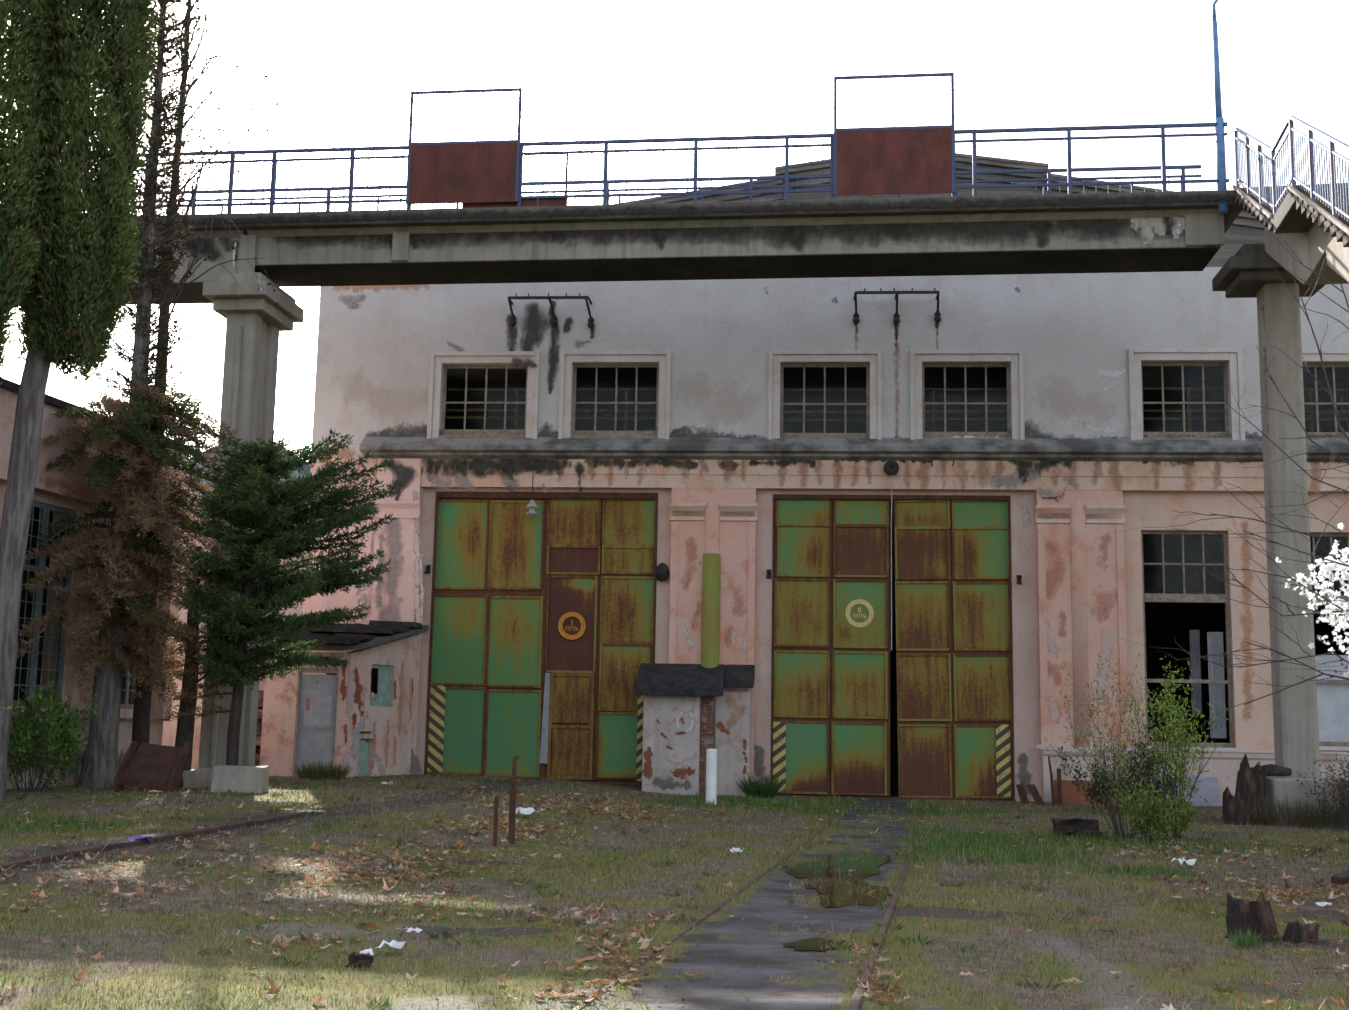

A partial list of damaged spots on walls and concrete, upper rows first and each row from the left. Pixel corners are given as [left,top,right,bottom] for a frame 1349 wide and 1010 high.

leakage [175,195,1236,267]
leakage [507,301,573,394]
leakage [718,460,815,471]
spalling [340,664,375,769]
spalling [642,718,686,778]
spalling [671,764,695,779]
spalling [716,722,748,774]